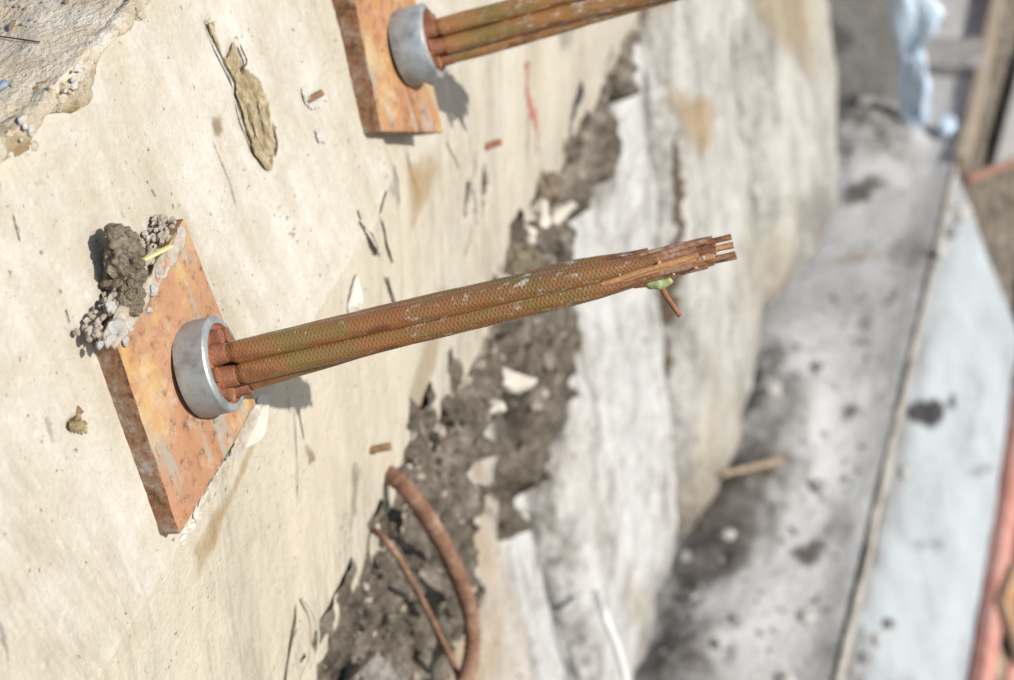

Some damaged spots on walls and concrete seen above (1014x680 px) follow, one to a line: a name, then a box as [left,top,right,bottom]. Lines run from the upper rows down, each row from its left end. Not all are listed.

spalling [0,0,151,164]
spalling [206,20,278,170]
spalling [302,87,328,110]
peeling [358,191,394,263]
peeling [464,171,488,224]
peeling [347,275,363,313]
spalling [371,466,481,680]